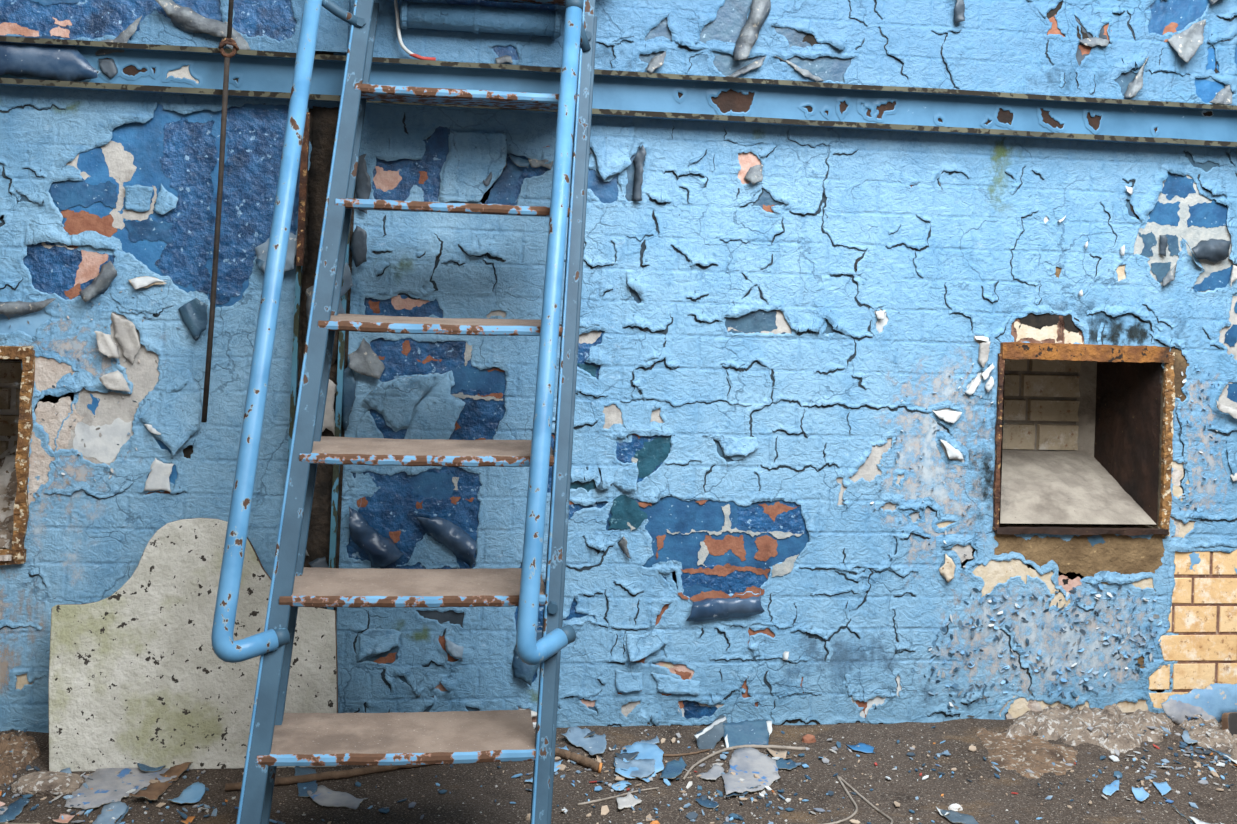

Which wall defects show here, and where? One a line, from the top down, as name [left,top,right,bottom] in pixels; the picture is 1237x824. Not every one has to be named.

crack [848,0,911,79]
peeling [0,0,302,510]
peeling [284,106,339,358]
peeling [340,465,486,569]
peeling [322,331,515,440]
crack [372,213,506,300]
peeling [554,399,819,810]
crack [529,125,1046,503]
crack [557,497,1038,727]
flaking render [830,145,1237,725]
crack [1086,175,1225,351]
crack [1175,404,1237,548]